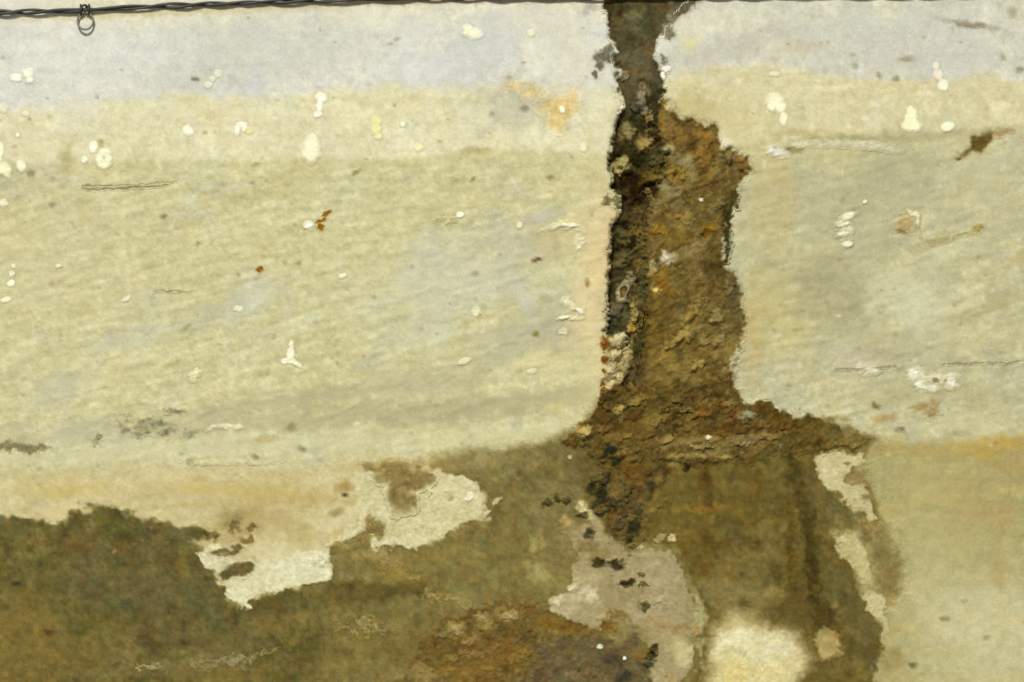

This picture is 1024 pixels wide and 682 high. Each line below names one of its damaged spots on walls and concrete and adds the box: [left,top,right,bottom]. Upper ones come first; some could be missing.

corrosion [314,209,332,232]
corrosion [596,333,614,394]
spalling [540,97,907,682]
leakage [0,398,599,682]
peeling [194,467,504,612]
leakage [644,411,911,682]